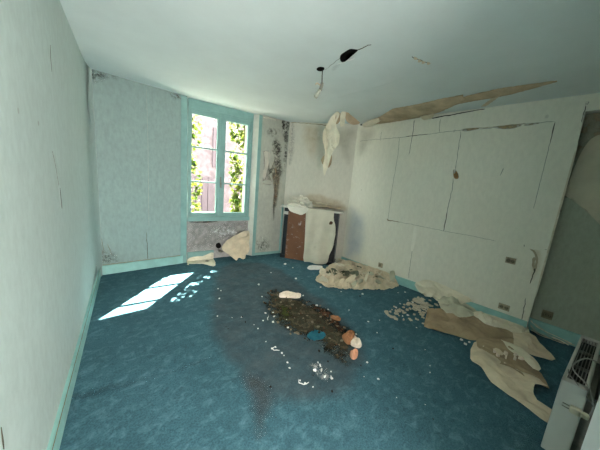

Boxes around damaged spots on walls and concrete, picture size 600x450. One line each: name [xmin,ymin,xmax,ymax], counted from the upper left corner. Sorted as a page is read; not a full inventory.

damp [268,121,325,214]
peeling [321,112,340,176]
crack [363,109,555,278]